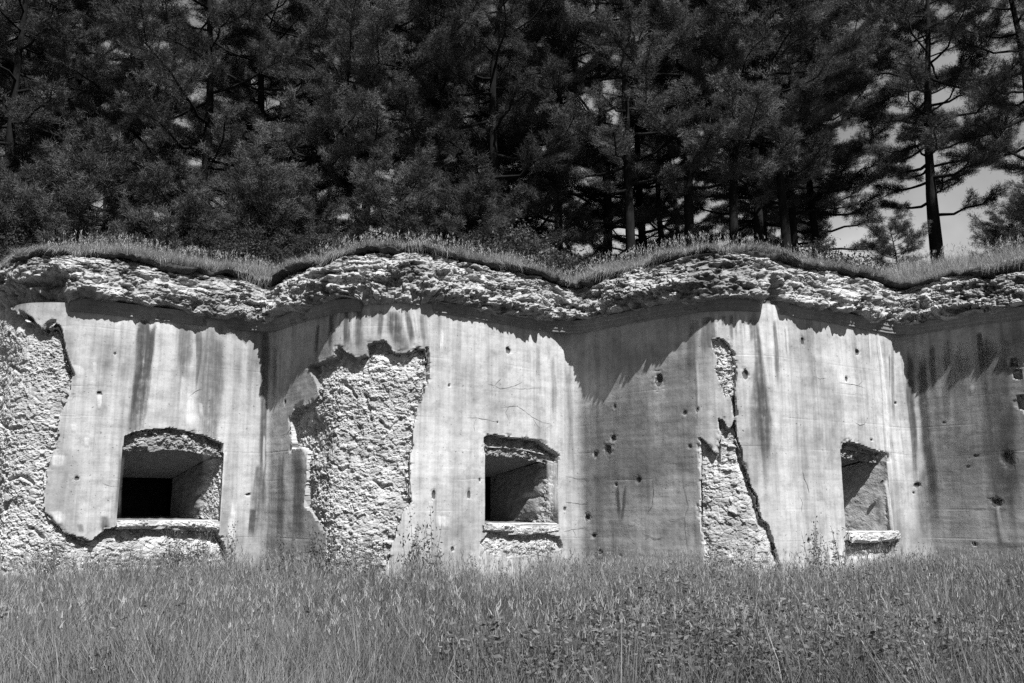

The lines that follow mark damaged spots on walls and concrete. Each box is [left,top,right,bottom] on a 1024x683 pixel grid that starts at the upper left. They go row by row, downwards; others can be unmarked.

damp [131,321,155,421]
damp [180,334,215,429]
spalling [0,252,1024,576]
crack [700,344,779,563]
damp [907,351,937,504]